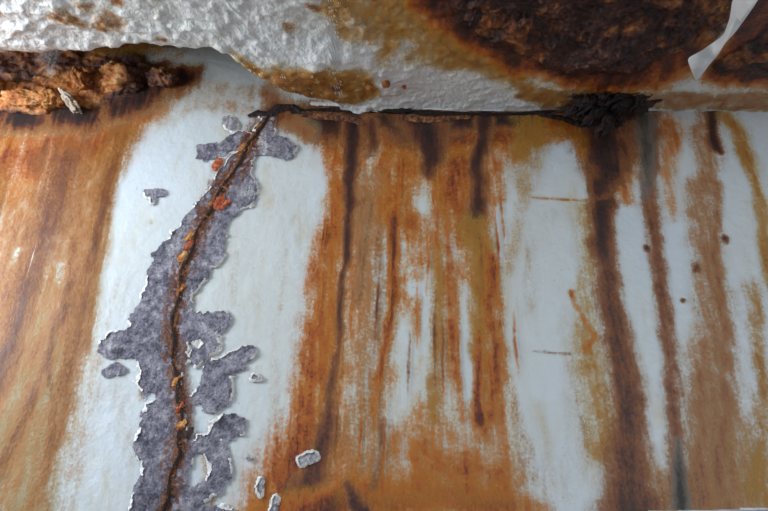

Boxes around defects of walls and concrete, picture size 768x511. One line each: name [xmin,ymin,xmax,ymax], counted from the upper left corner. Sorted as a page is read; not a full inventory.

rust [0,86,179,511]
spalling [0,42,204,140]
peeling [97,115,299,511]
peeling [296,449,321,468]
crack [157,101,582,511]
rust [233,0,768,511]
spalling [403,0,768,96]